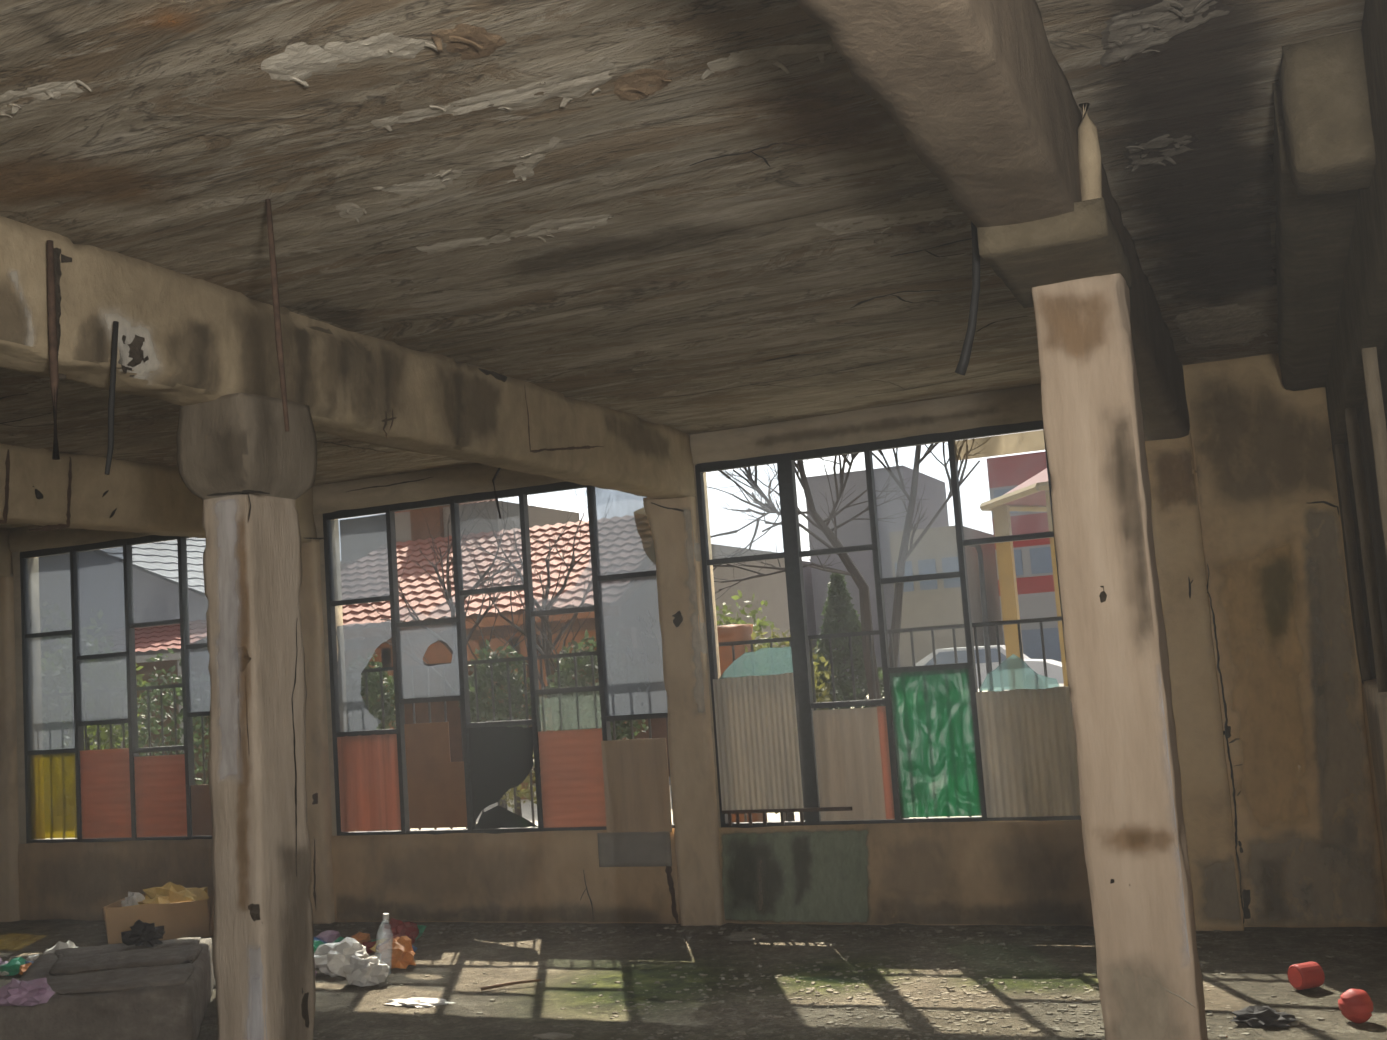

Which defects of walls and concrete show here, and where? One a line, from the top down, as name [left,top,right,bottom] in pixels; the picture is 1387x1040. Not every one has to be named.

peeling [261,23,507,88]
peeling [0,80,92,118]
crack [1188,564,1251,924]
water stain [1204,511,1387,923]
water stain [728,837,811,912]